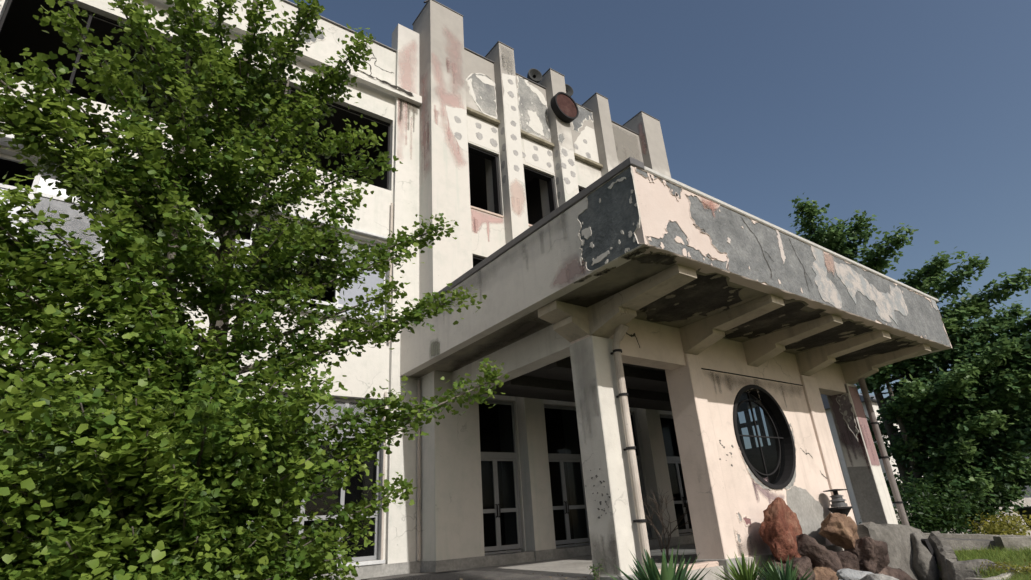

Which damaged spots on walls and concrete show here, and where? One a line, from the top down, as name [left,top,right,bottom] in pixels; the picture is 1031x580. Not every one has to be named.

damp [512,182,525,214]
damp [471,210,503,241]
peeling [446,73,951,363]